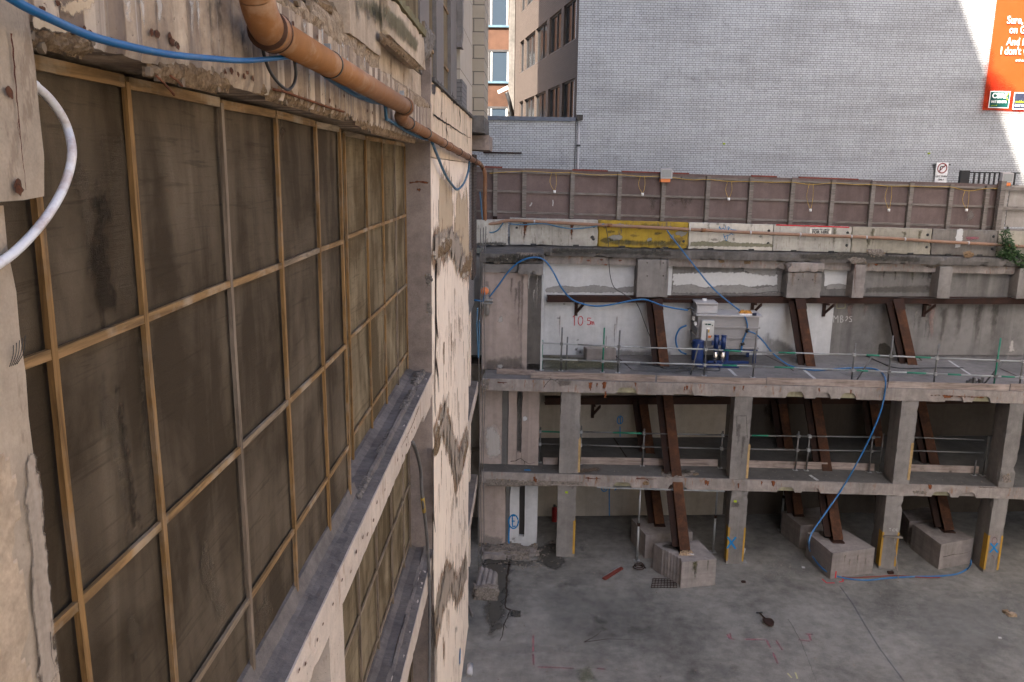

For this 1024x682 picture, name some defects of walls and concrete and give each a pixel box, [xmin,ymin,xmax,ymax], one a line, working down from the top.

spalling [31,27,96,59]
spalling [142,62,231,96]
corrosion [14,178,24,196]
peeling [433,165,473,302]
peeling [434,315,468,477]
spalling [454,437,468,494]
peeling [0,453,59,682]